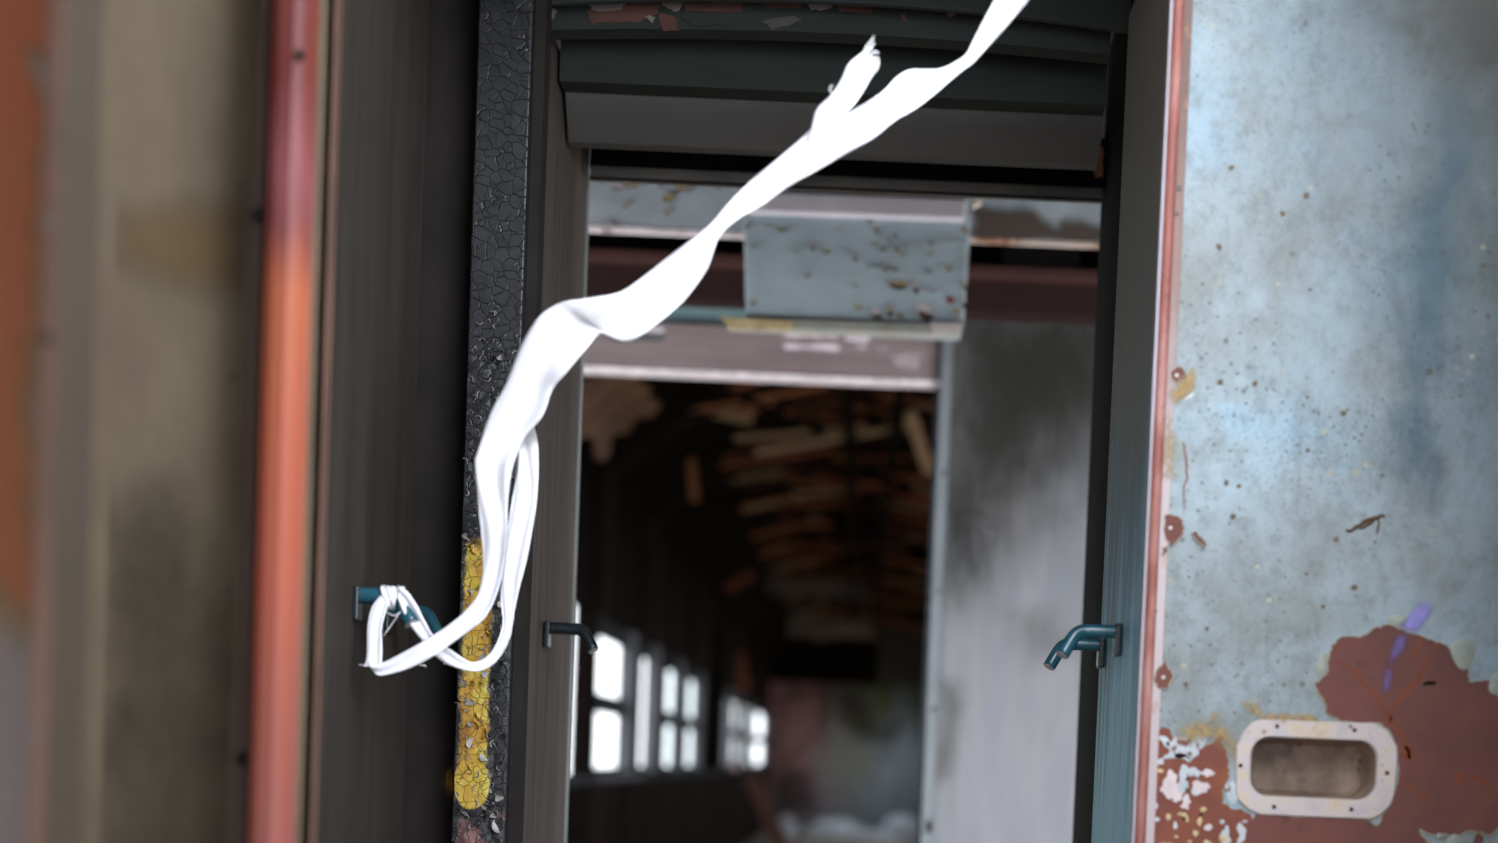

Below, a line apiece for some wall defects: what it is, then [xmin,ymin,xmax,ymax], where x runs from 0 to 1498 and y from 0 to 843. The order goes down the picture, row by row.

peeling [587,2,743,32]
peeling [762,3,872,30]
peeling [1154,615,1498,843]